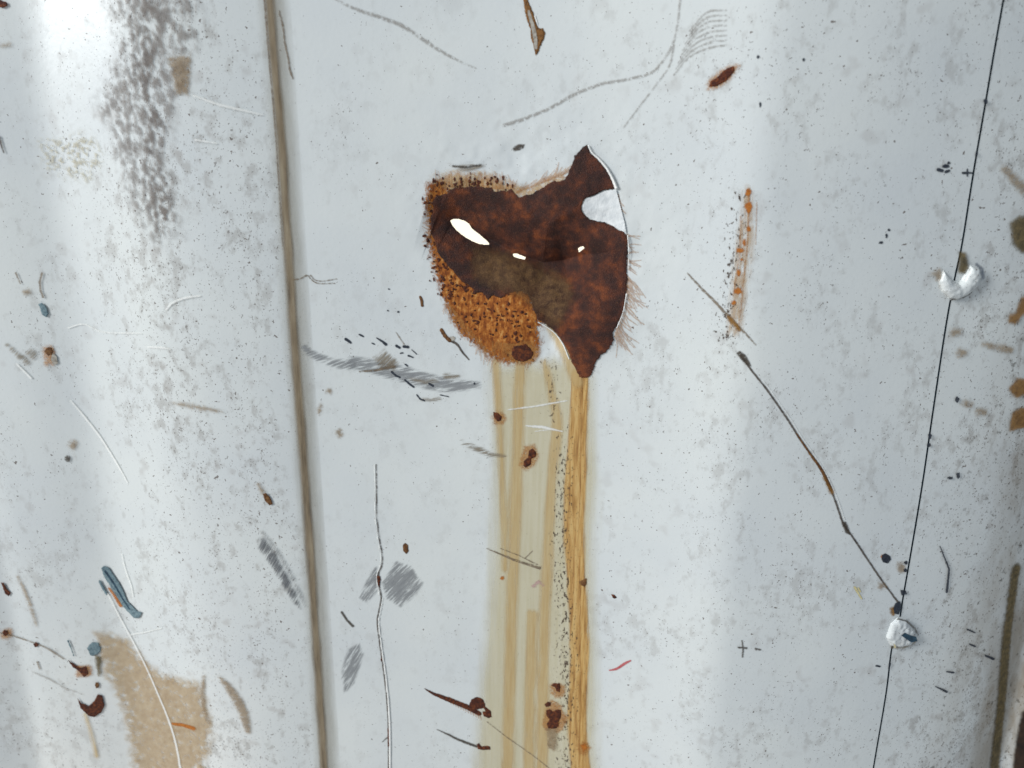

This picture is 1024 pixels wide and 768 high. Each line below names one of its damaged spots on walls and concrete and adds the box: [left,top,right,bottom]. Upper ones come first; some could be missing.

rust [709,66,736,88]
rust [715,188,752,353]
crack [374,464,391,768]
rust [422,172,591,768]